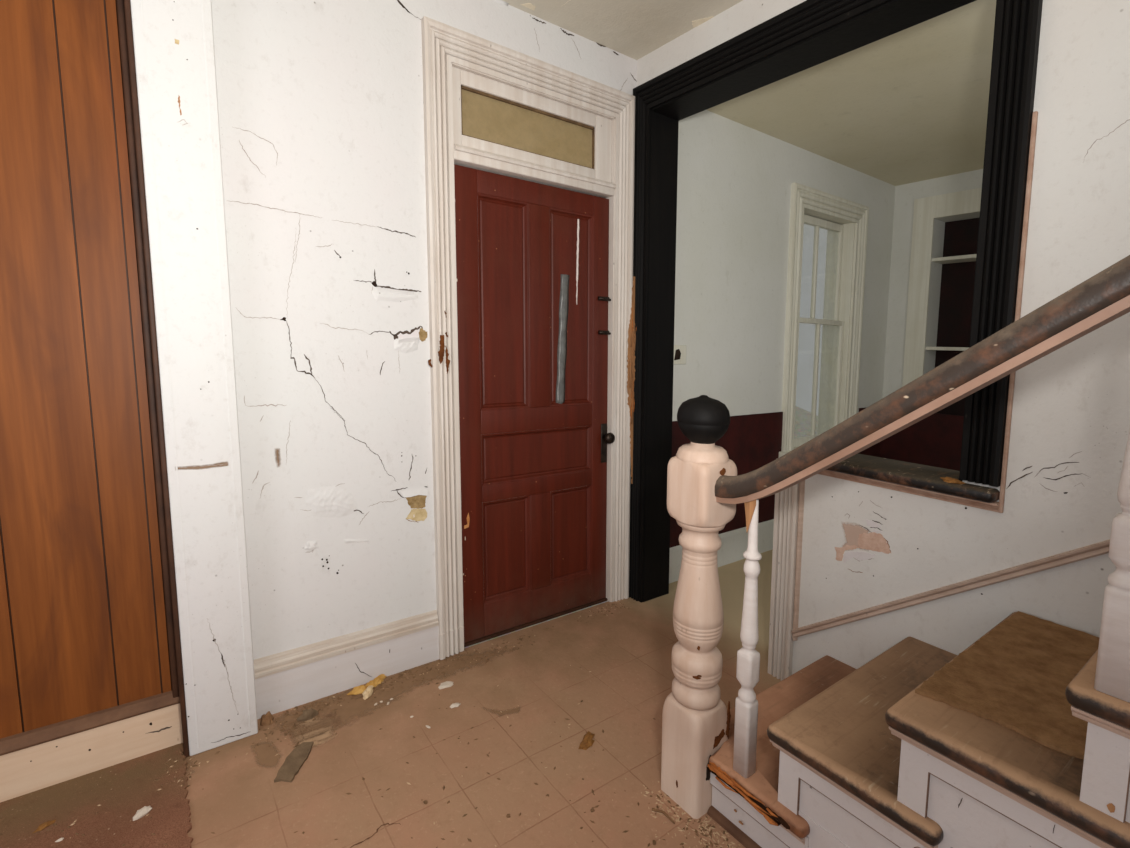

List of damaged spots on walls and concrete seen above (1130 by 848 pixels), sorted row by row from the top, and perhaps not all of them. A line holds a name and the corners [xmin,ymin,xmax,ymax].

crack [234,127,278,177]
crack [230,201,421,479]
spalling [320,323,450,373]
spalling [370,469,428,522]
spalling [835,491,891,576]
crack [209,624,248,743]
peeling [706,701,790,829]